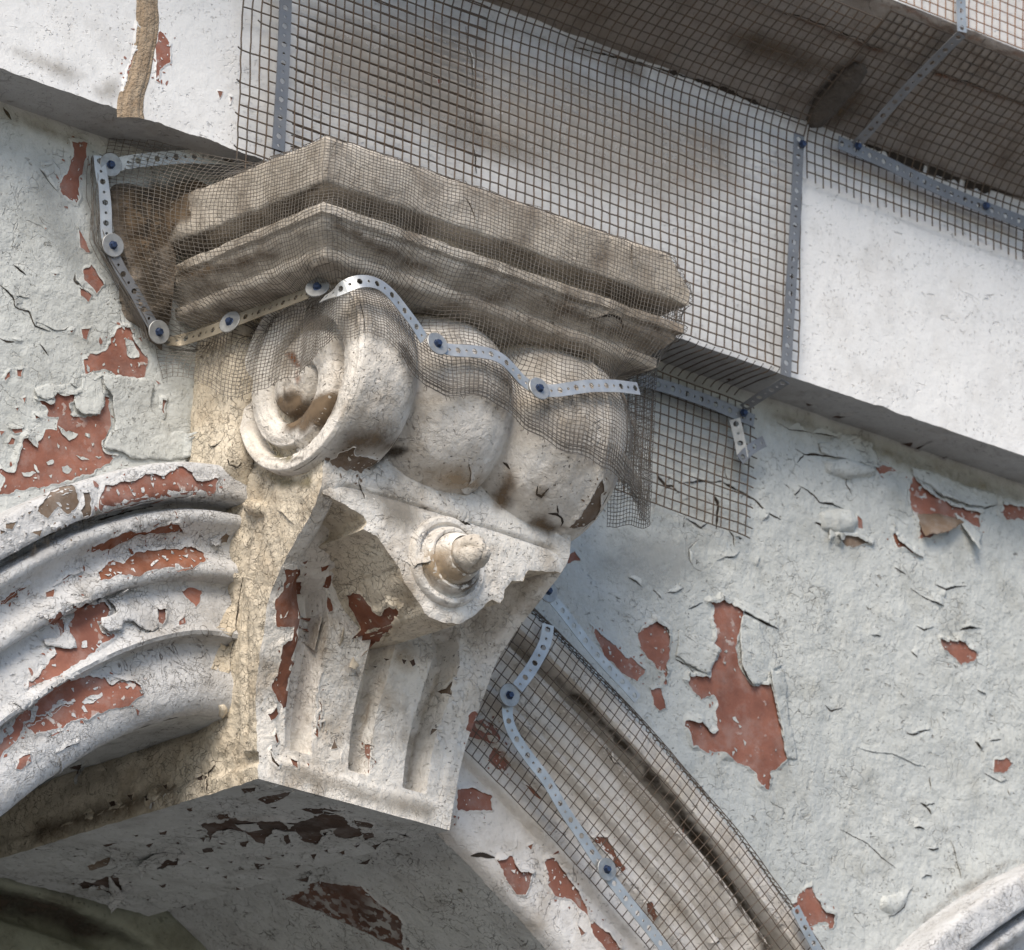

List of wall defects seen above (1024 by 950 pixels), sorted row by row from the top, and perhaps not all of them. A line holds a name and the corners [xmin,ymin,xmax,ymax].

peeling [56,136,90,209]
crack [0,258,68,355]
peeling [819,434,1024,558]
peeling [0,321,235,770]
peeling [267,561,407,719]
peeling [313,667,337,749]
peeling [589,591,798,791]
peeling [187,806,381,879]
peeling [282,865,409,950]
peeling [494,844,625,950]
peeling [790,881,838,930]